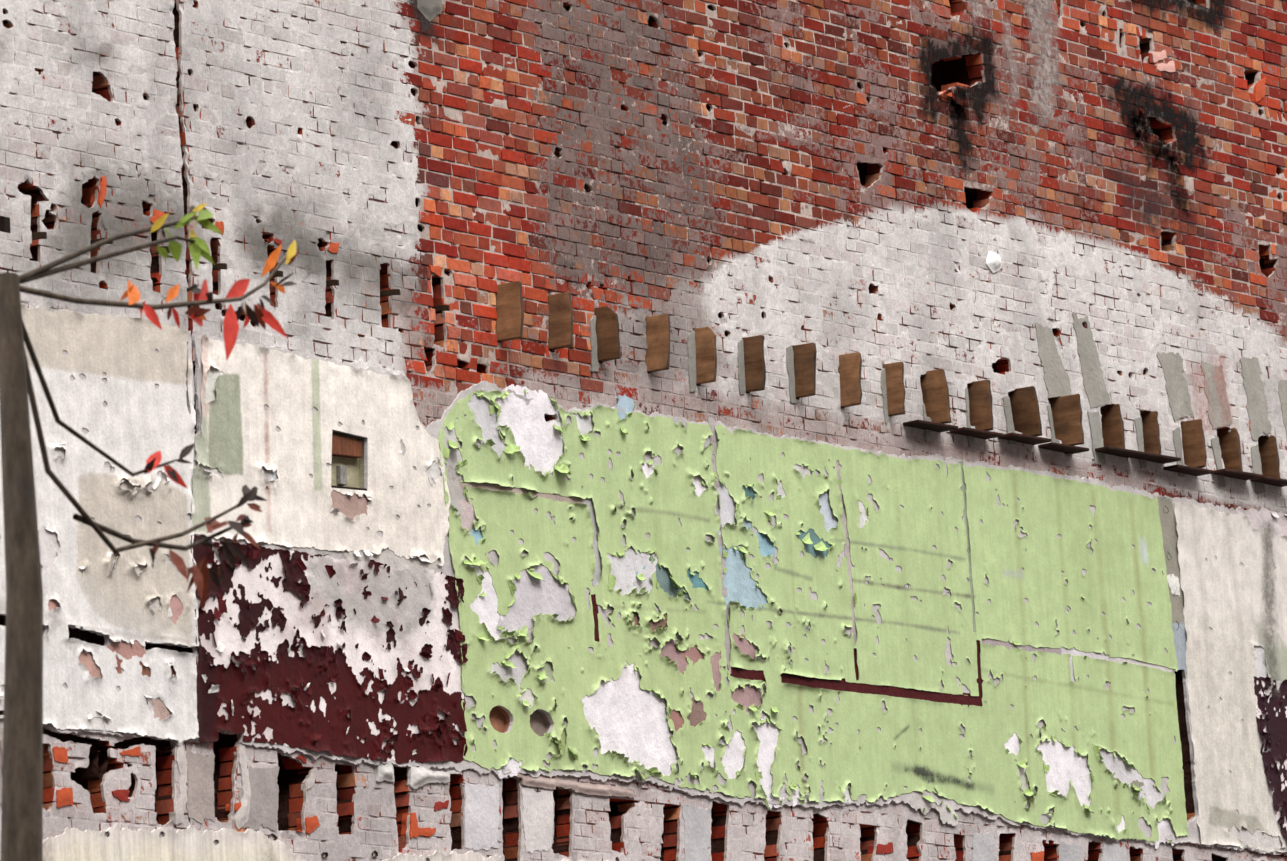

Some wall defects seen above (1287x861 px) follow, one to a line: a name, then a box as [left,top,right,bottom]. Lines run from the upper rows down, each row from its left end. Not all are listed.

spalling [1139,42,1176,72]
crack [172,4,191,320]
damp [947,91,975,171]
damp [1130,111,1189,216]
crack [191,363,199,434]
peeling [149,384,593,763]
peeling [607,472,776,659]
peeling [796,480,842,559]
spalling [44,746,141,808]
peeling [582,611,853,809]
peeling [1004,732,1176,849]
peeling [1228,645,1287,854]